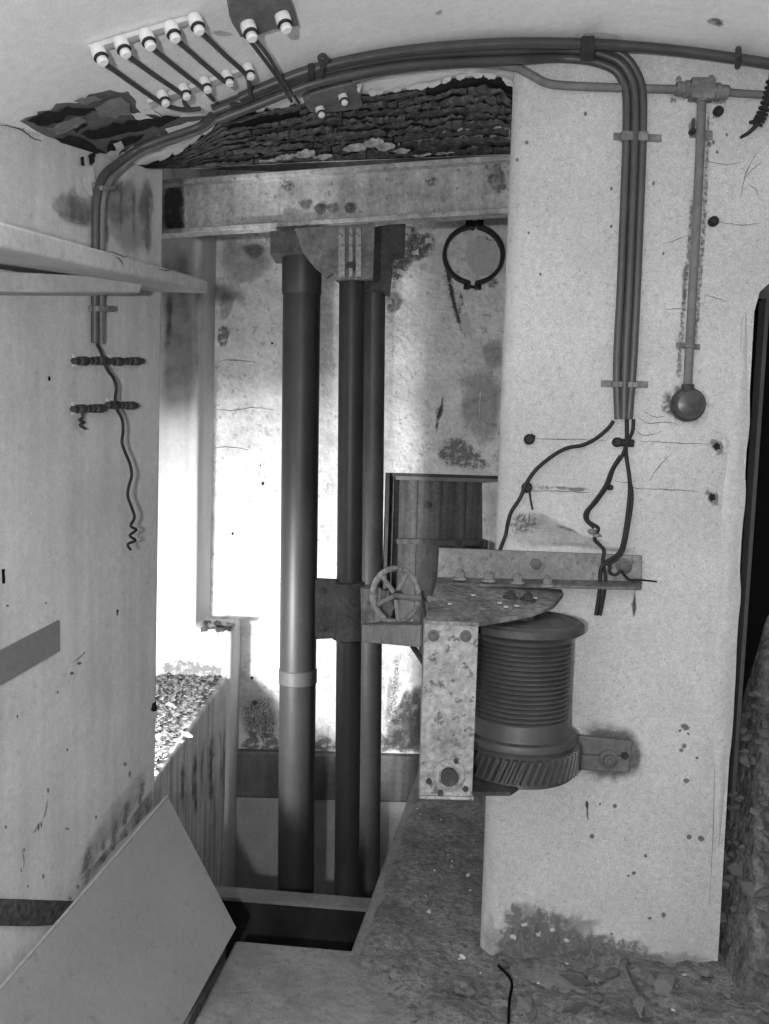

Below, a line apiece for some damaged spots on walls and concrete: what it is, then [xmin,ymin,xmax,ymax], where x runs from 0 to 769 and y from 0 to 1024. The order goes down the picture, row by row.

spalling [20,72,513,196]
damp [112,184,152,242]
corrosion [663,117,709,414]
damp [440,439,486,468]
crack [617,412,699,492]
damp [595,731,629,739]
damp [82,783,152,875]
damp [498,904,648,961]